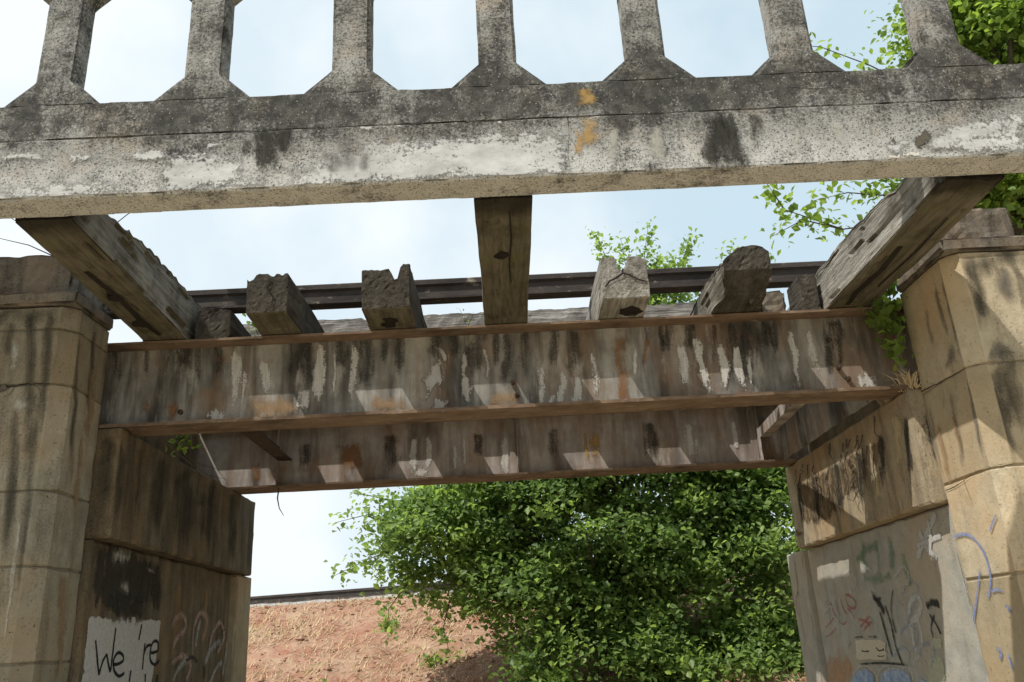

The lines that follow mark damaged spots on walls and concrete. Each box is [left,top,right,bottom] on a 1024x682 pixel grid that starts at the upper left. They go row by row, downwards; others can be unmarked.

rust [580,89,595,103]
damp [238,130,292,170]
damp [701,112,763,163]
damp [14,313,51,416]
damp [290,338,405,409]
damp [427,333,529,383]
damp [537,330,600,403]
rust [615,339,628,399]
damp [990,349,1020,441]
damp [4,425,28,553]
damp [93,545,162,620]